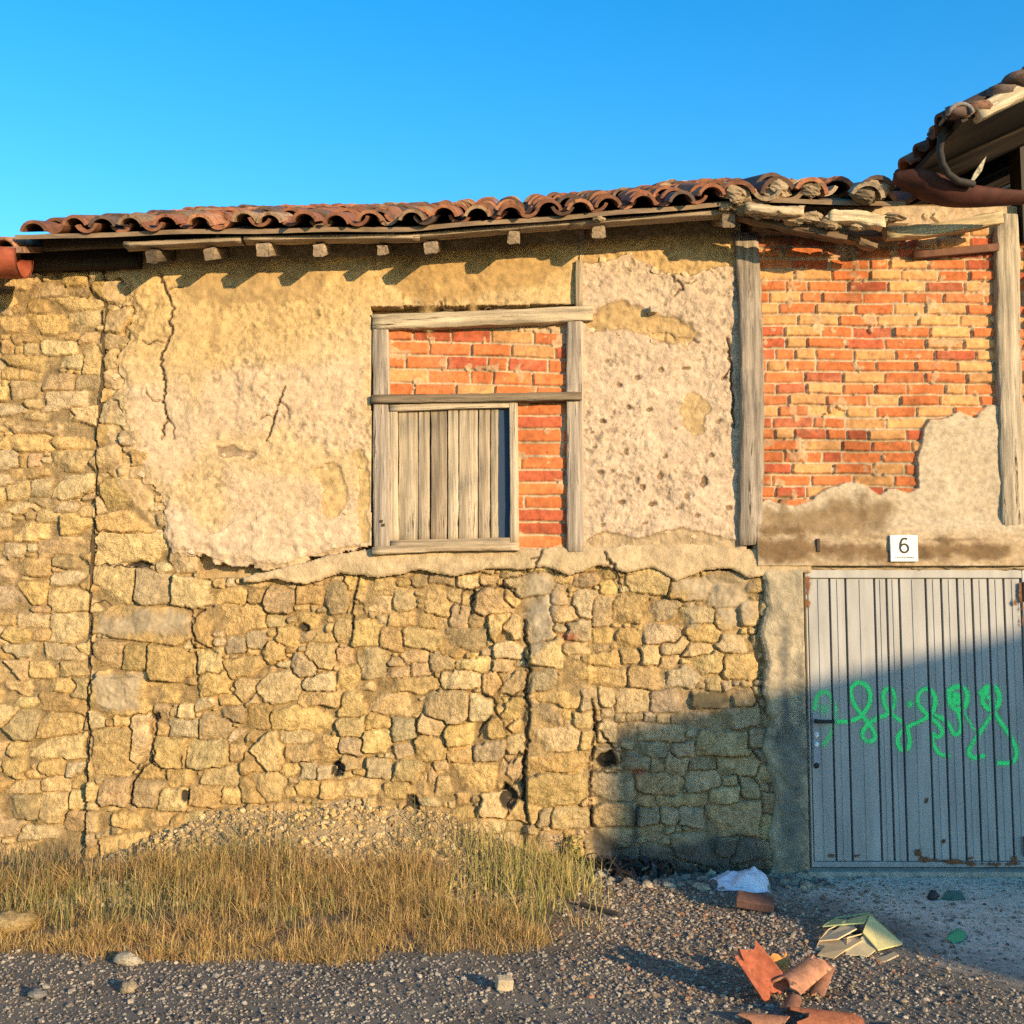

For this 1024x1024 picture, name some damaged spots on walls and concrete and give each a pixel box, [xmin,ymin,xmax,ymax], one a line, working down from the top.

crack [143,272,180,439]
flaking render [586,300,698,346]
crack [261,388,289,441]
crack [85,271,142,836]
damp [757,495,891,563]
damp [918,538,1010,559]
crack [478,621,531,824]
corrosion [915,849,1020,867]